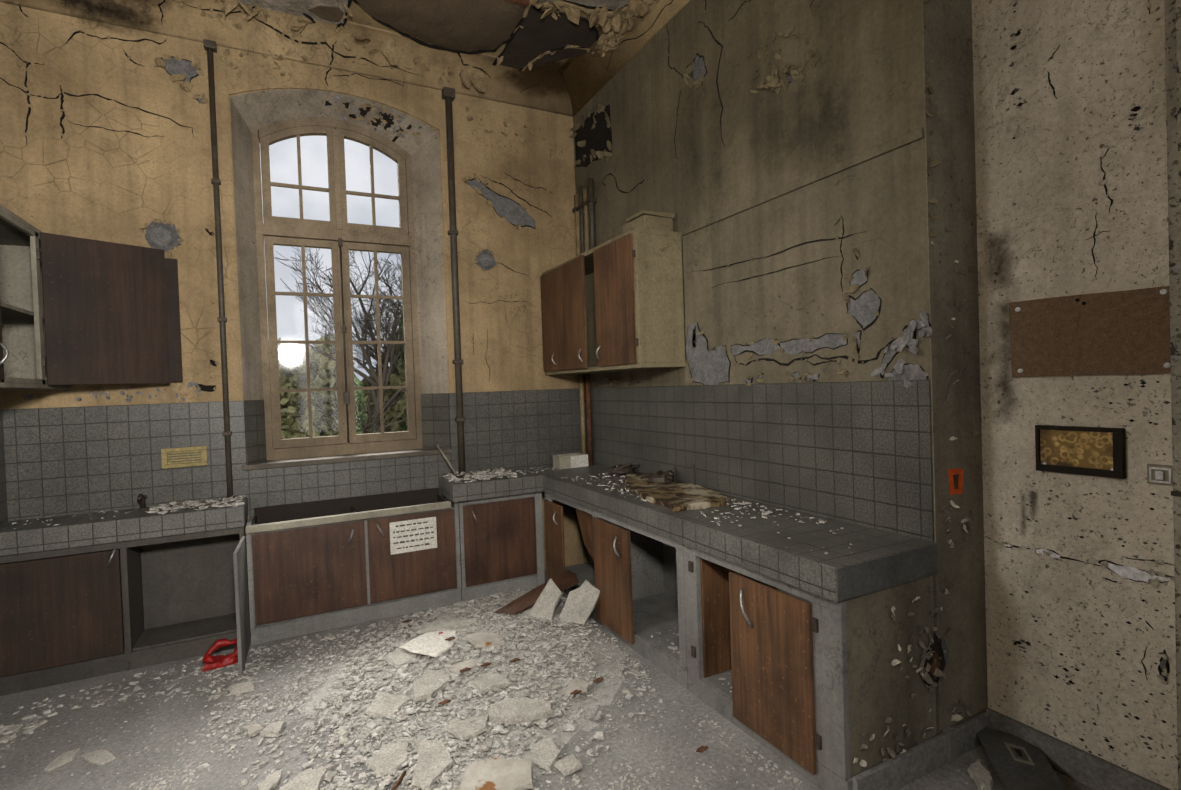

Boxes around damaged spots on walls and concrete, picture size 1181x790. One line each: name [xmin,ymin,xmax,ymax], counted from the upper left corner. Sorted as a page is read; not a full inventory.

water stain [62,0,151,27]
crack [0,0,423,145]
crack [606,0,684,161]
crack [698,0,750,146]
crack [1047,45,1060,99]
flaking render [569,104,614,169]
flaking render [139,218,184,253]
peeling [462,173,536,230]
crack [1087,145,1115,277]
peeling [686,248,882,386]
peeling [871,311,933,388]
flaking render [891,588,952,698]